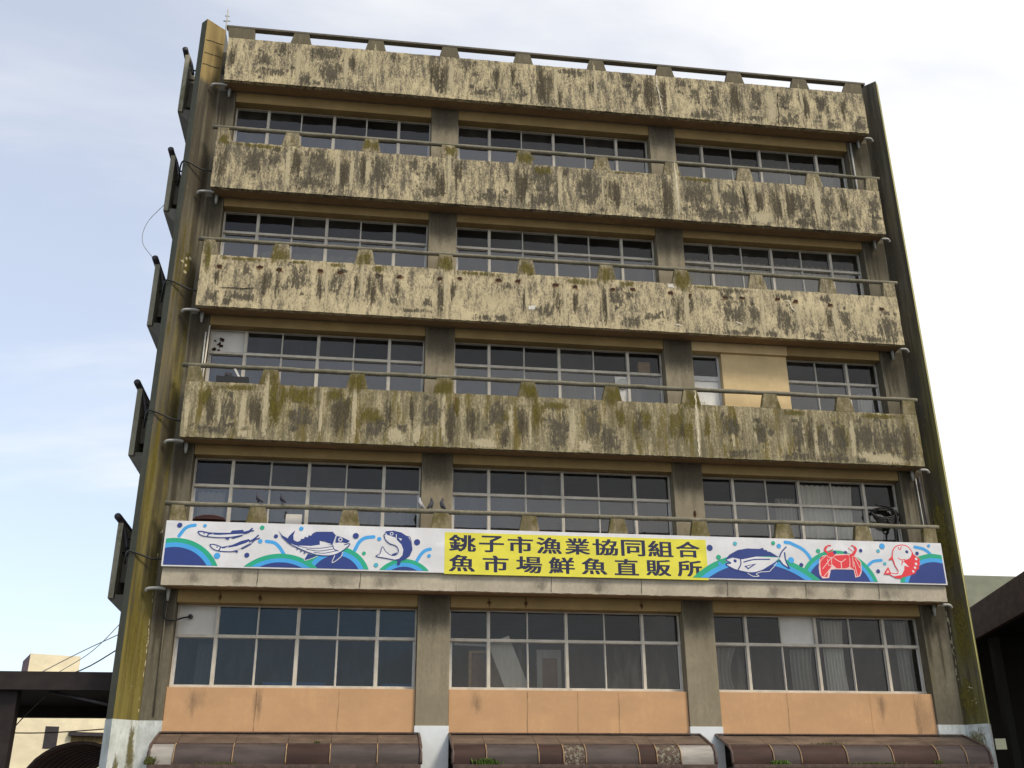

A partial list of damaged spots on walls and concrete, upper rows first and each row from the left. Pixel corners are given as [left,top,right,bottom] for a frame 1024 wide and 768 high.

leakage [533,66,563,105]
leakage [643,76,667,112]
leakage [335,151,371,194]
leakage [435,153,462,199]
leakage [601,176,622,208]
leakage [742,187,796,225]
leakage [147,395,192,509]
leakage [237,375,270,438]
leakage [318,376,357,437]
leakage [385,392,532,476]
leakage [568,406,593,452]
leakage [801,417,834,459]